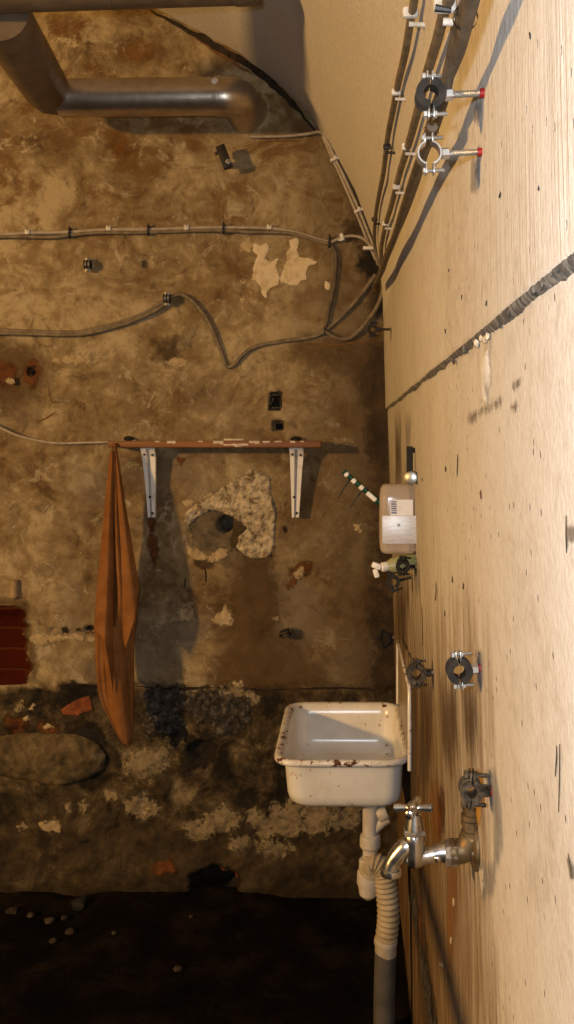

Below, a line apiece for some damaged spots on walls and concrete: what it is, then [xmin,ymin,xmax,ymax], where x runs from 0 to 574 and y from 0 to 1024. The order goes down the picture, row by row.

peeling [240,236,317,298]
spalling [182,469,287,569]
water stain [407,865,497,1024]